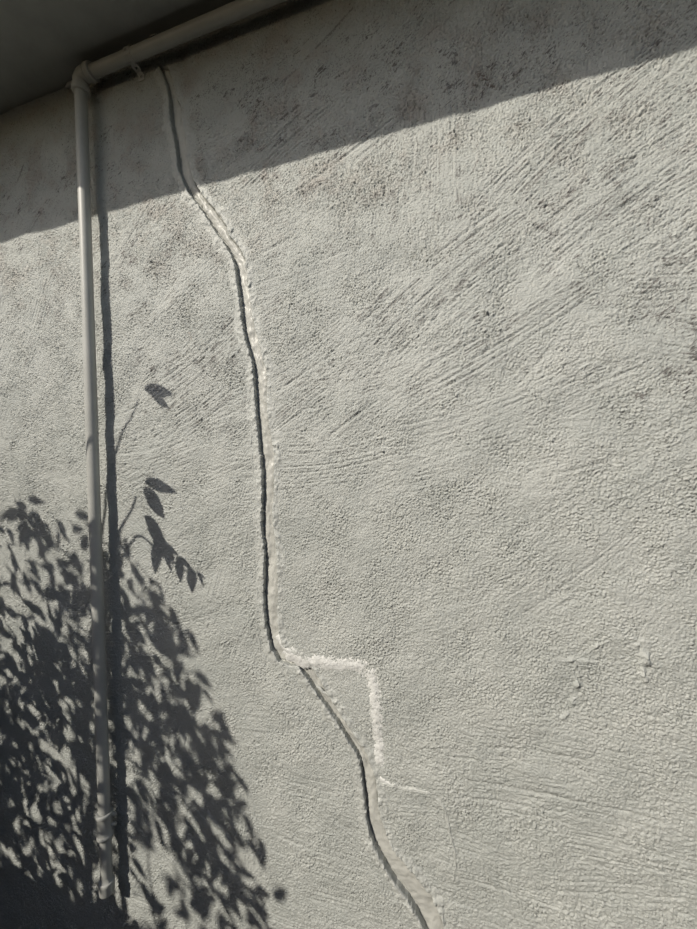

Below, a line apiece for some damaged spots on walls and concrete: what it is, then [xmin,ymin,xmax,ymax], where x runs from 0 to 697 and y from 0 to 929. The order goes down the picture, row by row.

crack [153,62,458,929]